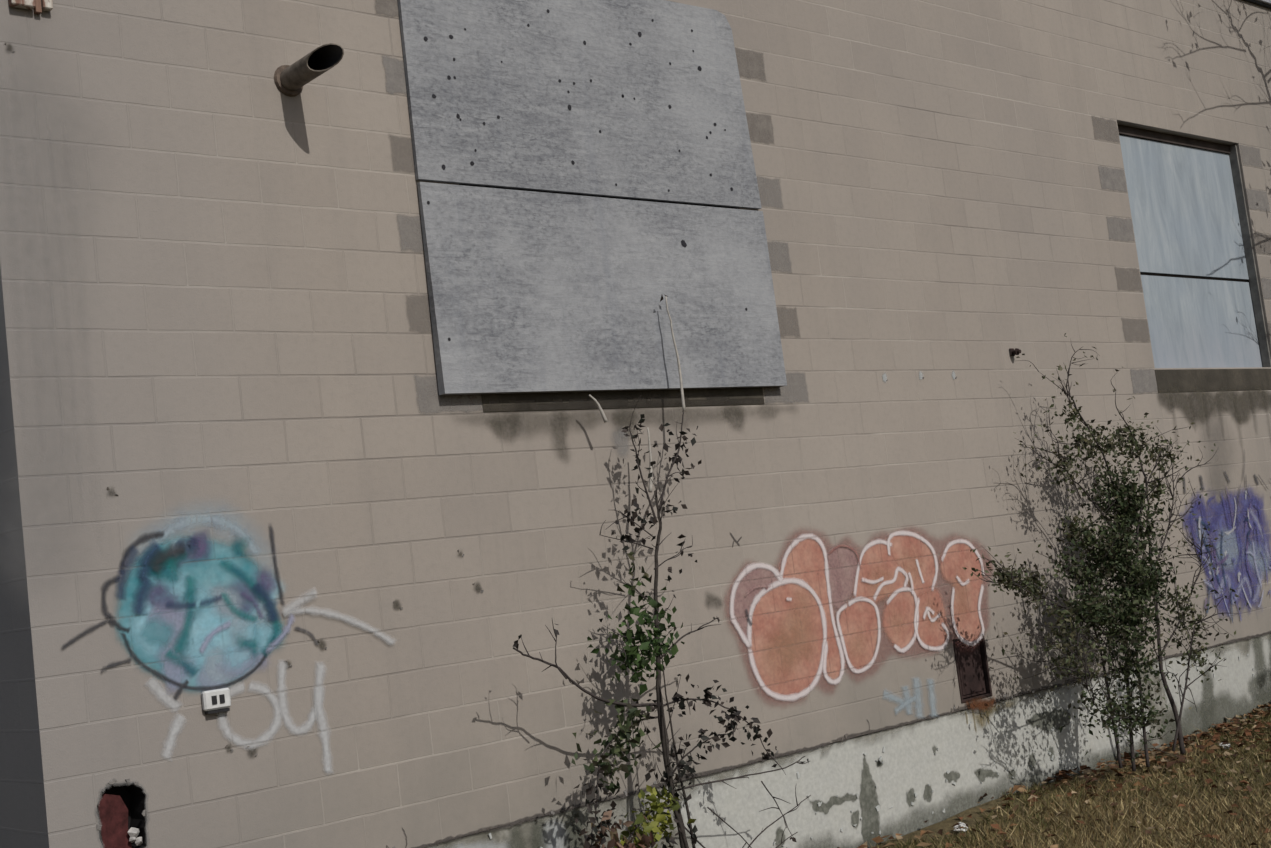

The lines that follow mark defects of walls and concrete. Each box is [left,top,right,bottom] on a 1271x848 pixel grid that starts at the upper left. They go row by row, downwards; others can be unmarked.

leakage [1159,388,1271,423]
spalling [96,778,146,848]